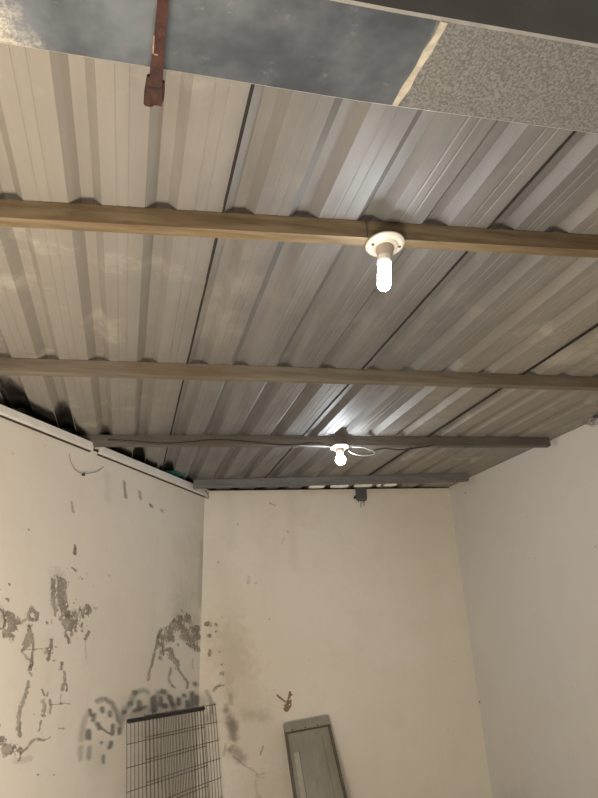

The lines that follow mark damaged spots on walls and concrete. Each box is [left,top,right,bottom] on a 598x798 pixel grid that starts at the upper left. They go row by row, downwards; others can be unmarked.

leakage [0,381,88,435]
leakage [110,447,188,481]
peeling [2,607,39,641]
peeling [50,575,92,644]
peeling [147,613,201,689]